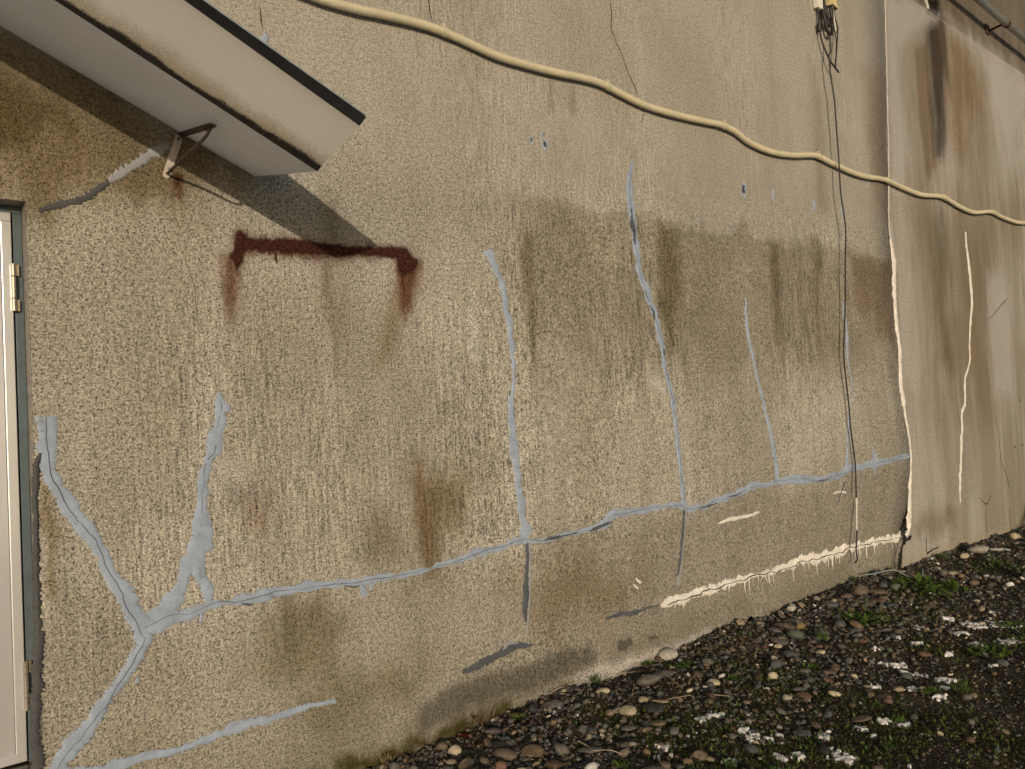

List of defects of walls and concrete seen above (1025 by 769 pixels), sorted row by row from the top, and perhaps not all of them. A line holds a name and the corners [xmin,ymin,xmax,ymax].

crack [610,2,645,123]
leakage [886,0,947,191]
leakage [958,33,1025,150]
crack [38,142,171,213]
corrosion [228,231,418,313]
crack [959,232,1011,530]
leakage [989,275,1013,396]
crack [34,158,911,769]